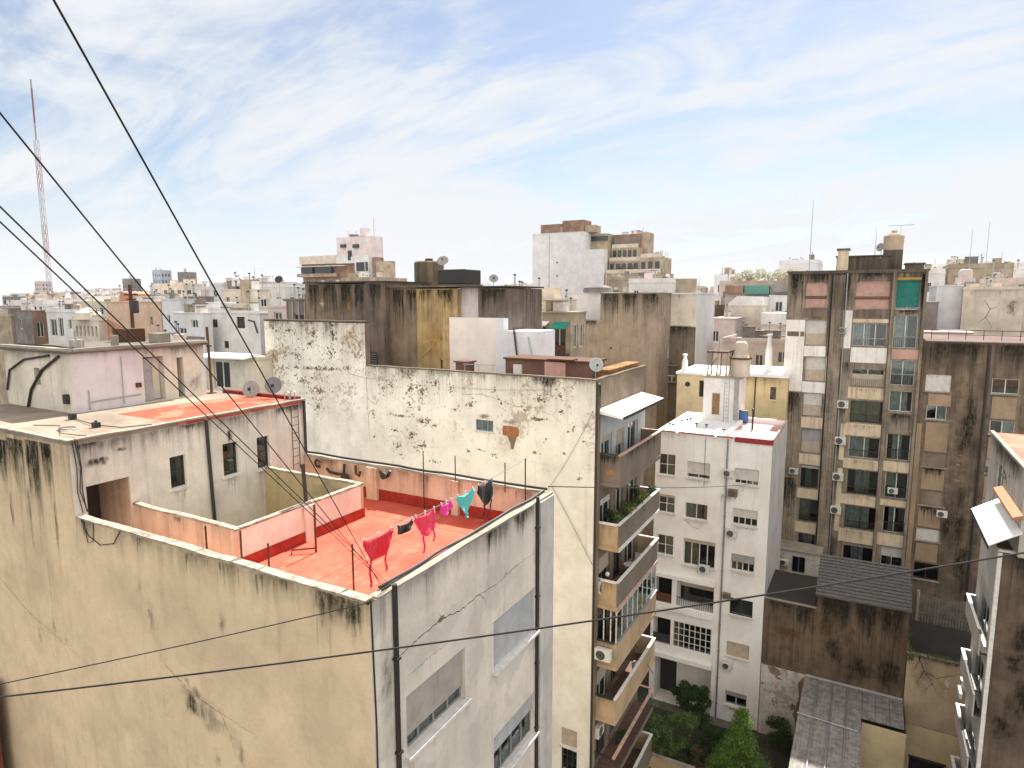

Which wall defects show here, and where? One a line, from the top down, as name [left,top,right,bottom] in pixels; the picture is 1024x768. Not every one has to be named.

damp [309,284,380,301]
damp [393,289,451,305]
peeling [268,324,360,415]
damp [0,438,50,483]
peeling [370,366,477,463]
spalling [502,426,519,449]
peeling [521,393,585,442]
damp [959,400,976,452]
damp [941,492,962,538]
crack [399,557,528,672]
damp [799,597,904,635]
crack [914,656,961,692]